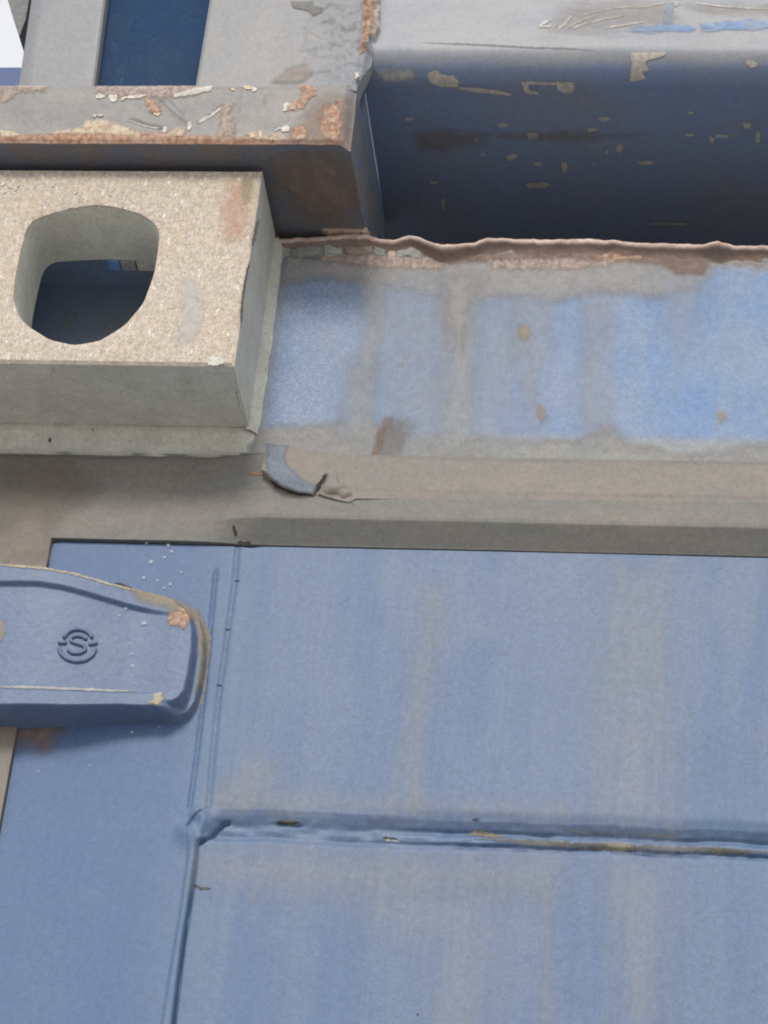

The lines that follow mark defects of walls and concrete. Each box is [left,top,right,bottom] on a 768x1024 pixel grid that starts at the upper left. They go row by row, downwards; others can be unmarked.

rust [360,0,380,53]
peeling [630,51,666,81]
peeling [96,85,212,102]
peeling [427,70,511,96]
peeling [521,81,575,95]
peeling [39,114,140,138]
peeling [162,122,192,137]
peeling [245,125,290,141]
rust [322,253,708,274]
damp [252,256,768,462]
peeling [266,444,316,492]